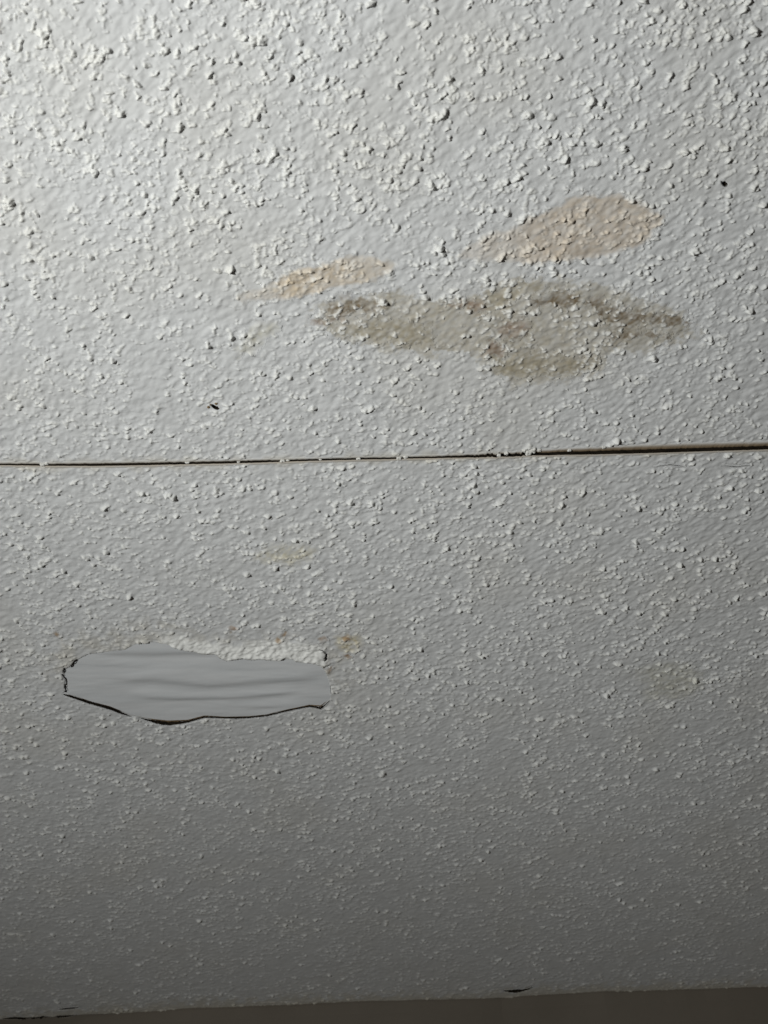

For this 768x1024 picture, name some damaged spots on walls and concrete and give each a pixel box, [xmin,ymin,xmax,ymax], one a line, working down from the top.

water stain [230,191,710,397]
crack [0,440,768,469]
spalling [61,636,331,726]